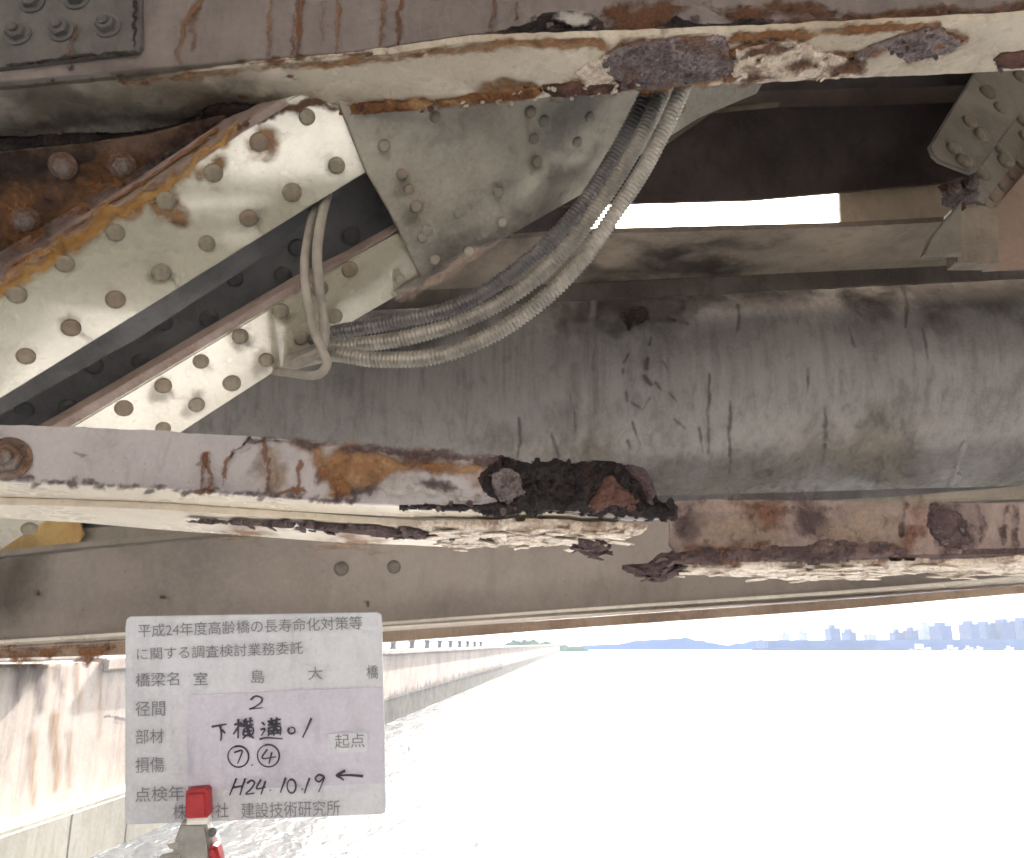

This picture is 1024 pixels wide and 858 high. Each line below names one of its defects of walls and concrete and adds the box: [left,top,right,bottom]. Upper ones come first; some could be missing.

rust [116,0,1024,85]
peeling [575,53,645,91]
peeling [723,39,854,84]
rust [0,78,640,301]
rust [937,175,981,211]
rust [17,437,926,568]
peeling [414,518,649,561]
peeling [622,520,1024,583]
rust [1000,506,1020,549]